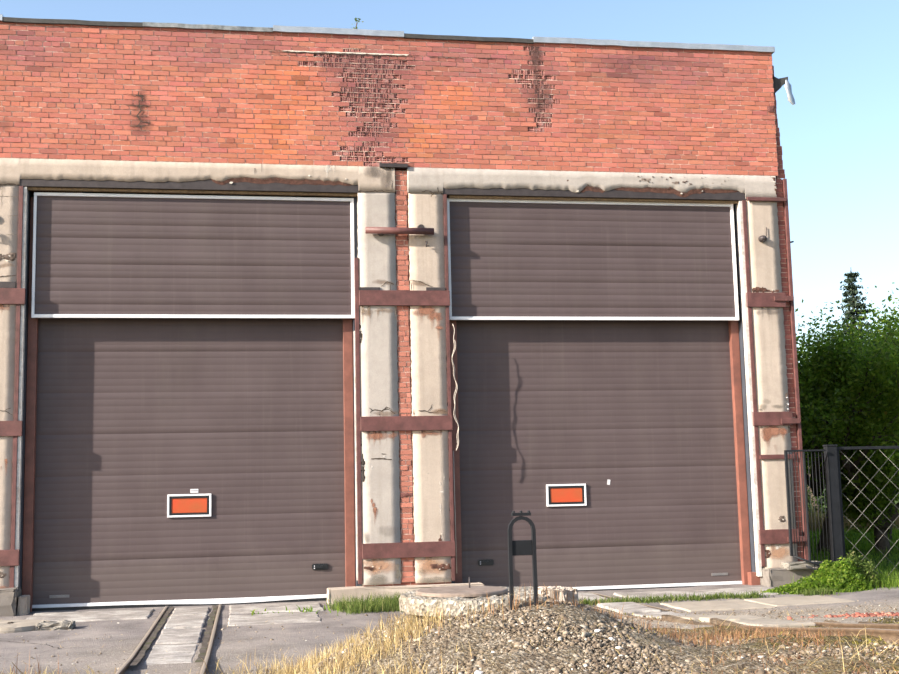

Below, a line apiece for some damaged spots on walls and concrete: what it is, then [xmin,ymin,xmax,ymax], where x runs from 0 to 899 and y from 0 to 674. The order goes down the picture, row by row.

spalling [211,175,351,186]
spalling [576,176,738,197]
rust [414,306,442,329]
rust [368,431,395,439]
rust [763,426,786,441]